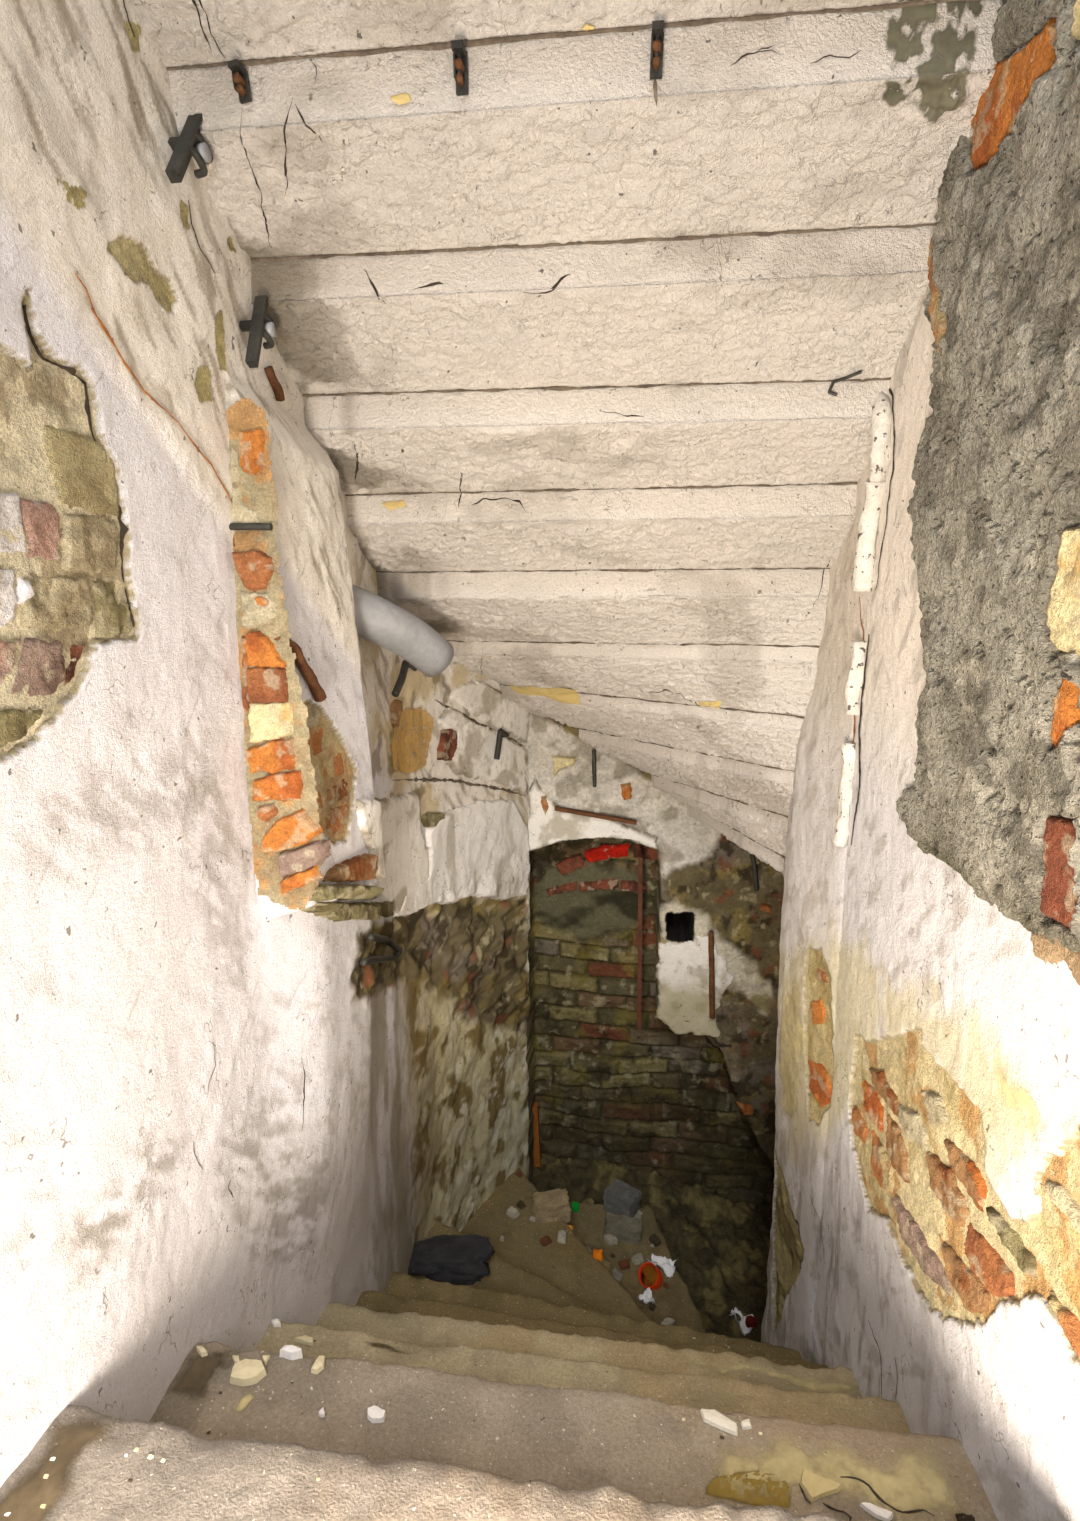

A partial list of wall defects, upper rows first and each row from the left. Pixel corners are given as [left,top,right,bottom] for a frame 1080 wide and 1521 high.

crack [192,0,225,58]
crack [240,53,323,248]
flaking render [971,0,1080,170]
flaking render [928,238,947,354]
spalling [0,305,135,757]
spalling [194,310,658,922]
flaking render [1046,526,1080,655]
flaking render [1051,678,1080,749]
flaking render [1040,816,1078,929]
spalling [806,948,834,1124]
spalling [852,1030,1080,1361]